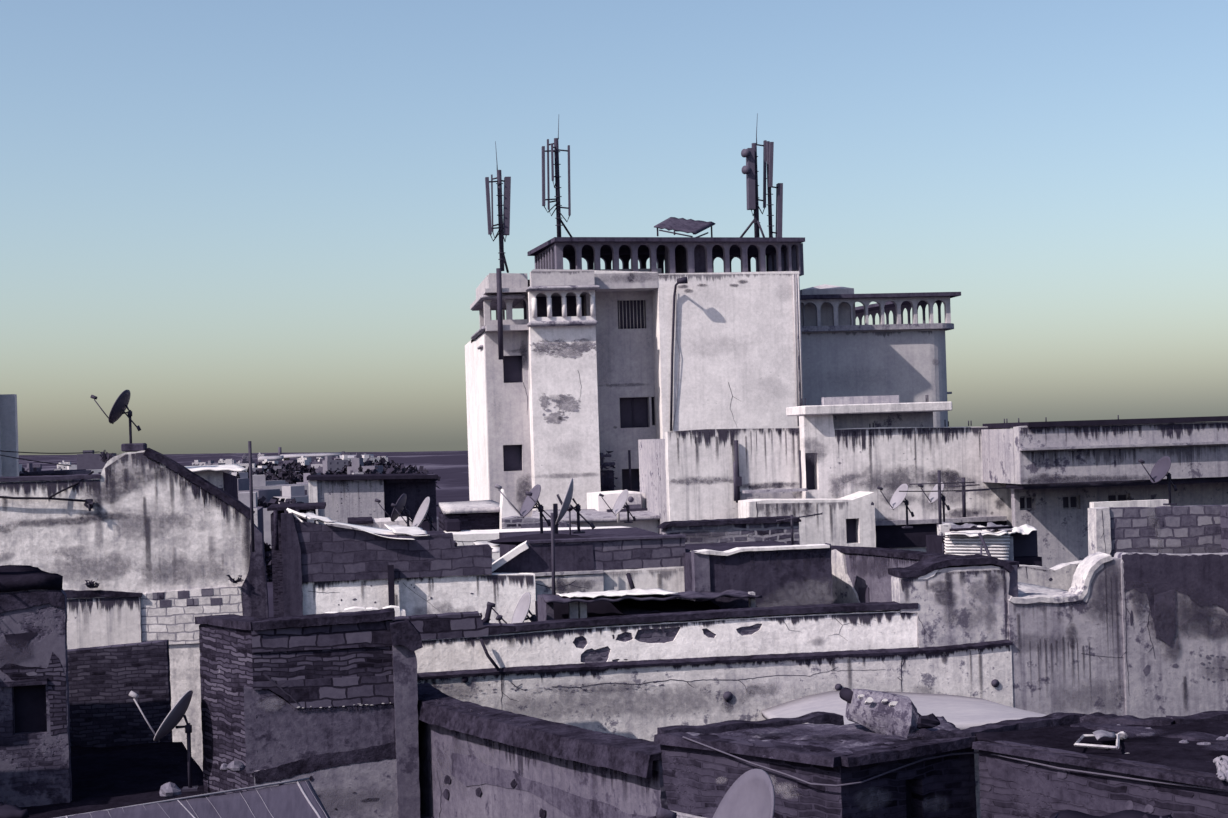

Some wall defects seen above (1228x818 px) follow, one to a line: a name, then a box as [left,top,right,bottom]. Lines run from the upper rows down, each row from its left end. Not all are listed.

peeling [533,338,596,359]
peeling [540,393,580,424]
leakage [670,428,800,453]
leakage [835,423,1228,461]
leakage [1028,474,1128,485]
leakage [0,452,250,550]
leakage [745,483,832,523]
leakage [1096,566,1228,656]
spalling [573,627,680,663]
spalling [736,624,762,636]
leakage [1030,627,1090,669]